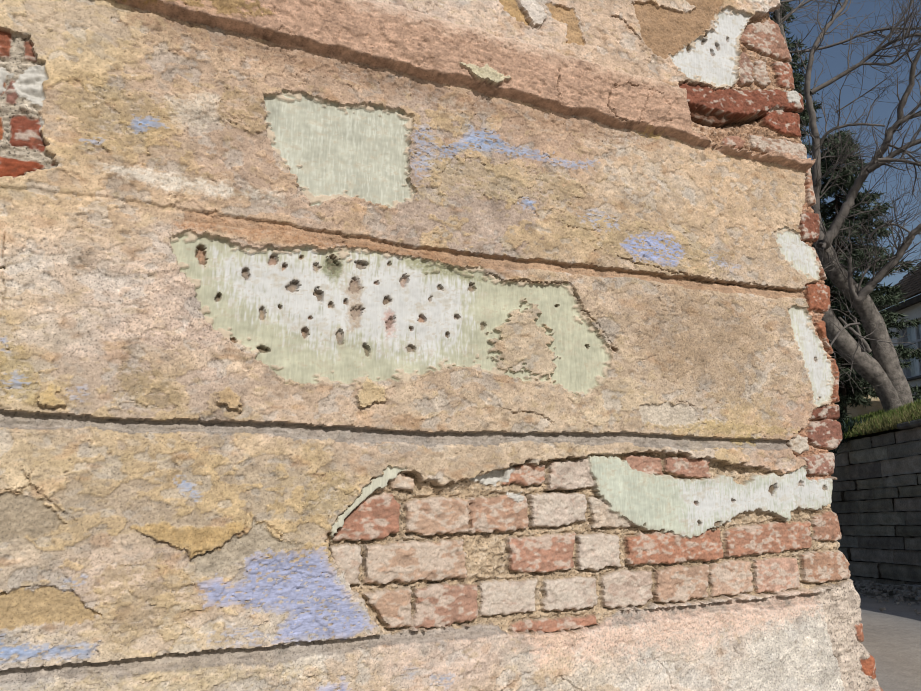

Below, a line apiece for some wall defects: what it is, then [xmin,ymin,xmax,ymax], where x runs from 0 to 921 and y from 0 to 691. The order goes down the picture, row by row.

flaking render [0,26,59,179]
peeling [264,89,418,209]
crack [0,227,8,321]
peeling [170,229,619,407]
flaking render [325,0,883,691]
peeling [215,386,243,411]
peeling [0,586,103,630]
crack [500,669,581,691]
crack [648,656,678,691]